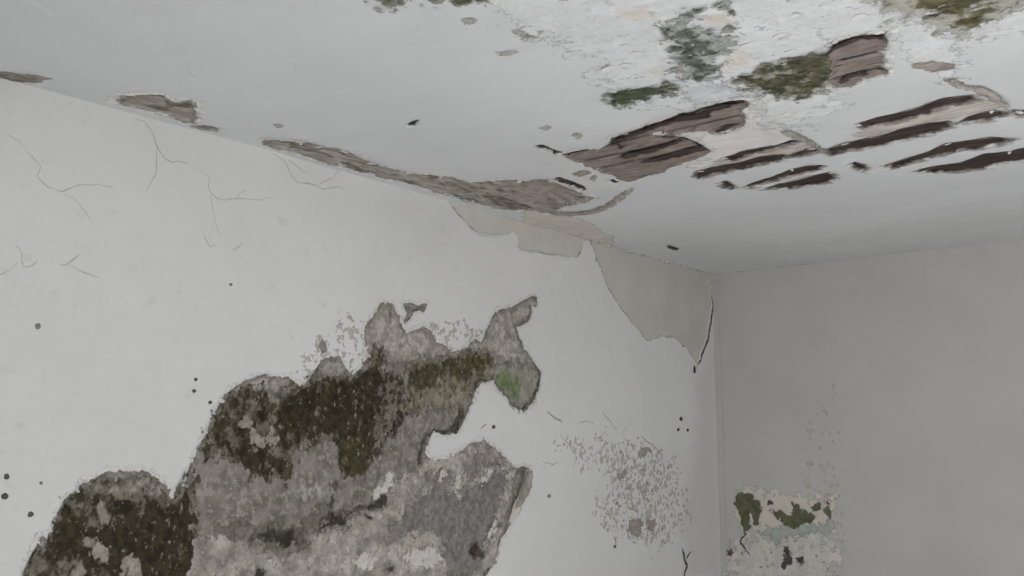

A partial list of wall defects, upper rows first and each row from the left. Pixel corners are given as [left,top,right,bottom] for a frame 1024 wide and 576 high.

water stain [600,1,842,110]
peeling [487,0,1024,190]
water stain [861,0,1024,41]
crack [693,285,713,374]
water stain [25,315,498,576]
peeling [722,483,847,576]